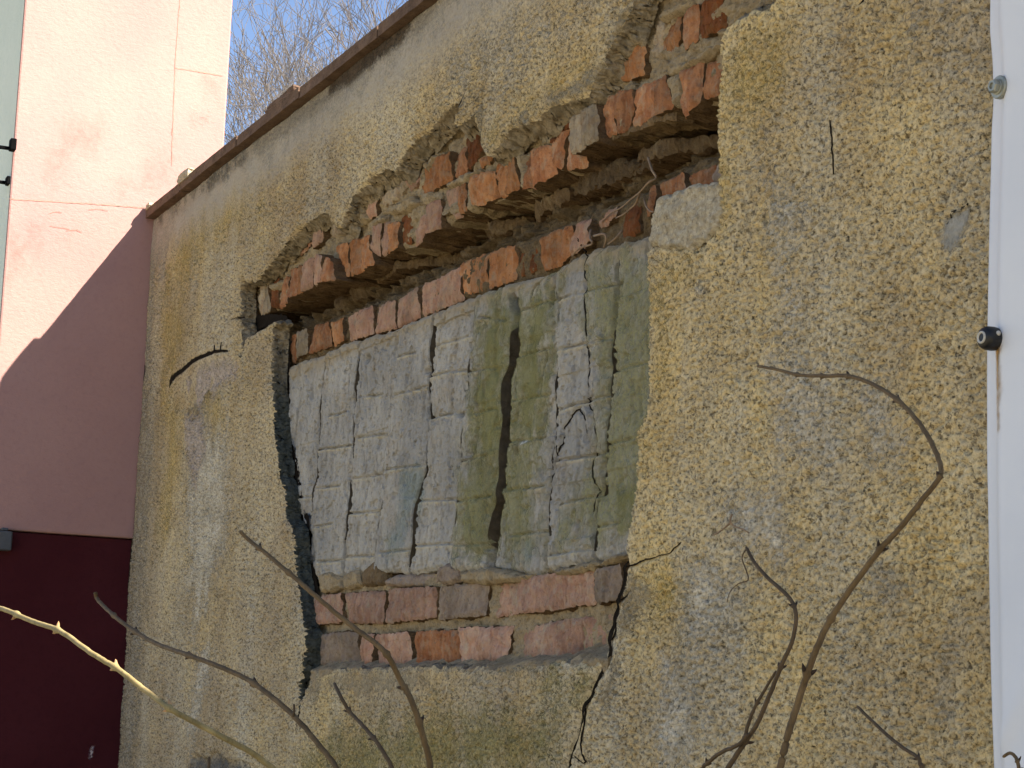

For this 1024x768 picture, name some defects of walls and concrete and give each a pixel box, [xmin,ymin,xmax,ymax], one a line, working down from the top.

crack [827,120,835,174]
crack [169,314,290,396]
flaking render [256,0,776,700]
crack [291,395,322,529]
crack [488,327,521,549]
crack [310,562,319,595]
crack [569,542,681,768]